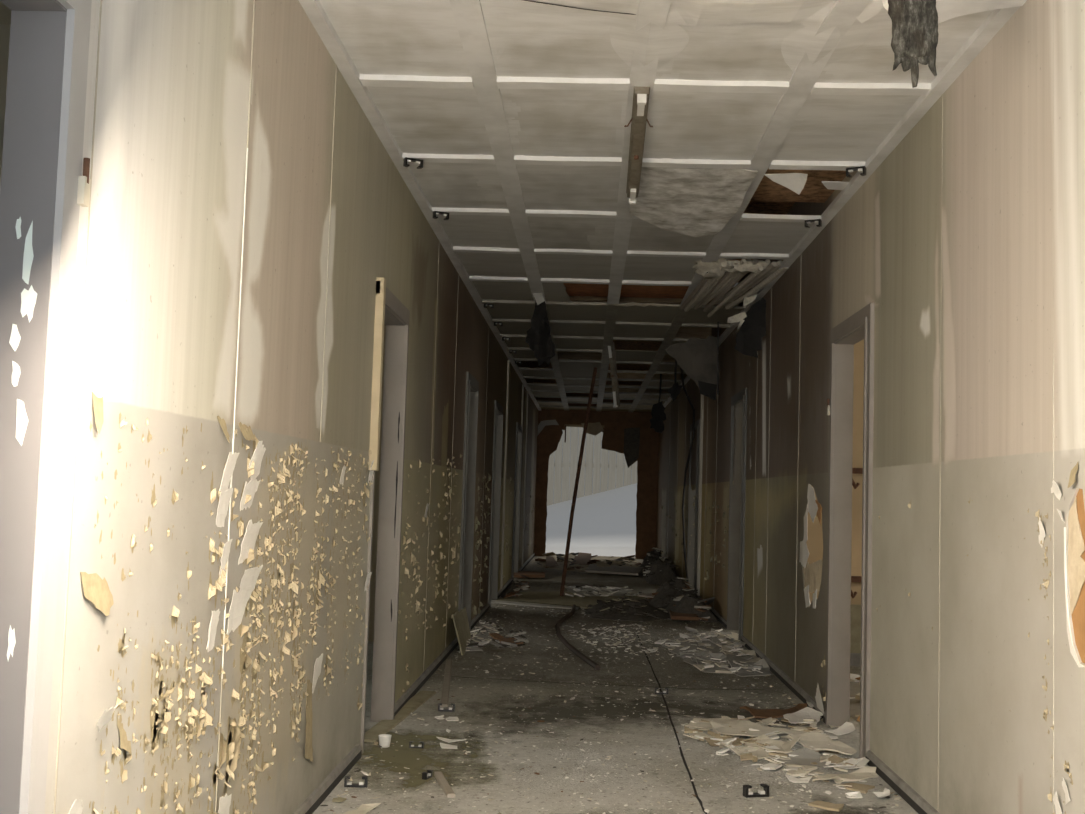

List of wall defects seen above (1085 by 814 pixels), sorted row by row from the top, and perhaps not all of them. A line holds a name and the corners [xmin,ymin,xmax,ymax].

peeling [9,217,37,446]
peeling [89,392,104,434]
peeling [7,625,16,660]
peeling [68,412,374,814]
peeling [398,454,462,693]
spalling [799,484,822,609]
spalling [1027,462,1085,667]
damp [356,697,887,814]